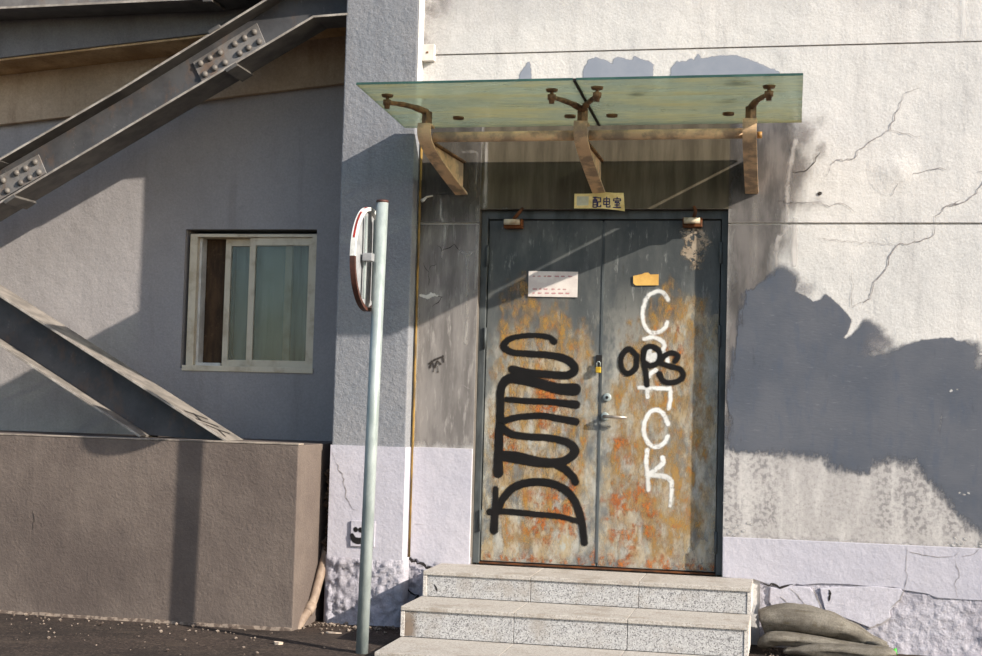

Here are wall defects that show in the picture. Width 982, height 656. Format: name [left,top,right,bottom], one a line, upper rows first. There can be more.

peeling [583,56,654,78]
peeling [670,54,780,76]
crack [794,88,920,176]
leakage [411,126,592,448]
peeling [681,228,712,269]
leakage [587,123,811,446]
crack [823,171,982,305]
corrosion [481,280,718,572]
flaking render [723,443,982,548]
crack [763,583,831,609]
crack [868,549,979,629]